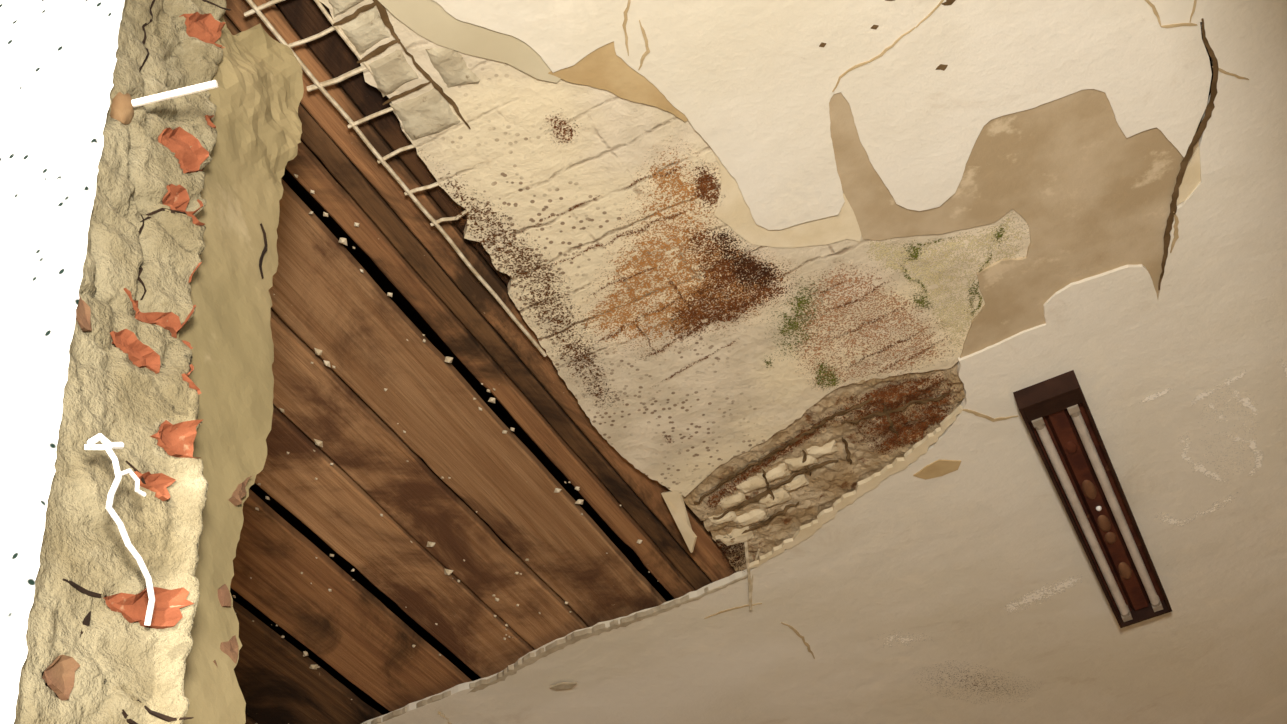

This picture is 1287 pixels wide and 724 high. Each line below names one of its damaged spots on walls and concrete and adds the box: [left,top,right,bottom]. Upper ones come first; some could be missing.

flaking render [179,12,226,48]
crack [832,0,944,92]
flaking render [158,126,209,226]
crack [1145,0,1249,290]
flaking render [110,288,201,395]
flaking render [319,0,1201,693]
leakage [765,279,827,368]
leakage [815,363,840,391]
leakage [867,212,1029,348]
flaking render [150,419,204,459]
flaking render [134,471,176,501]
flaking render [363,691,451,724]